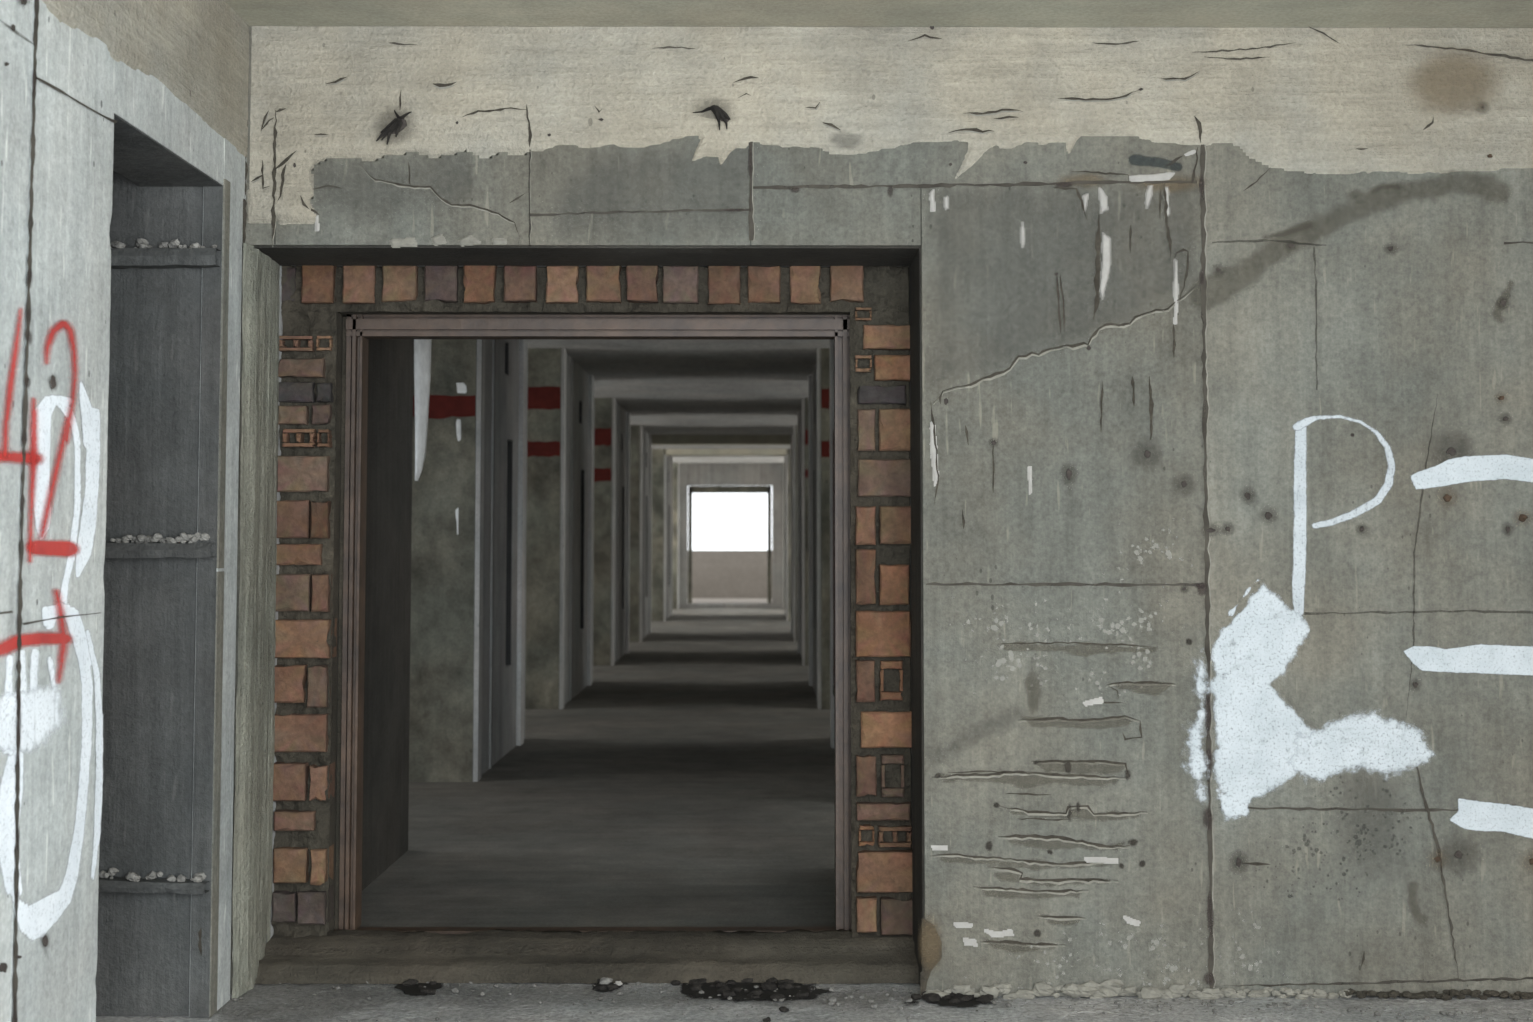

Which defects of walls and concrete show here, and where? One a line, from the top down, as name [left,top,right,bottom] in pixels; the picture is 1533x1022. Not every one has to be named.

crack [949,109,1023,135]
crack [1058,27,1338,143]
crack [1416,45,1533,61]
peeling [42,0,1533,451]
crack [933,284,1199,405]
peeling [414,339,432,481]
spalling [929,398,948,504]
spalling [1021,681,1176,740]
spalling [1206,461,1230,988]
spalling [931,760,1148,895]
spalling [920,916,1086,995]
spalling [1123,916,1141,926]